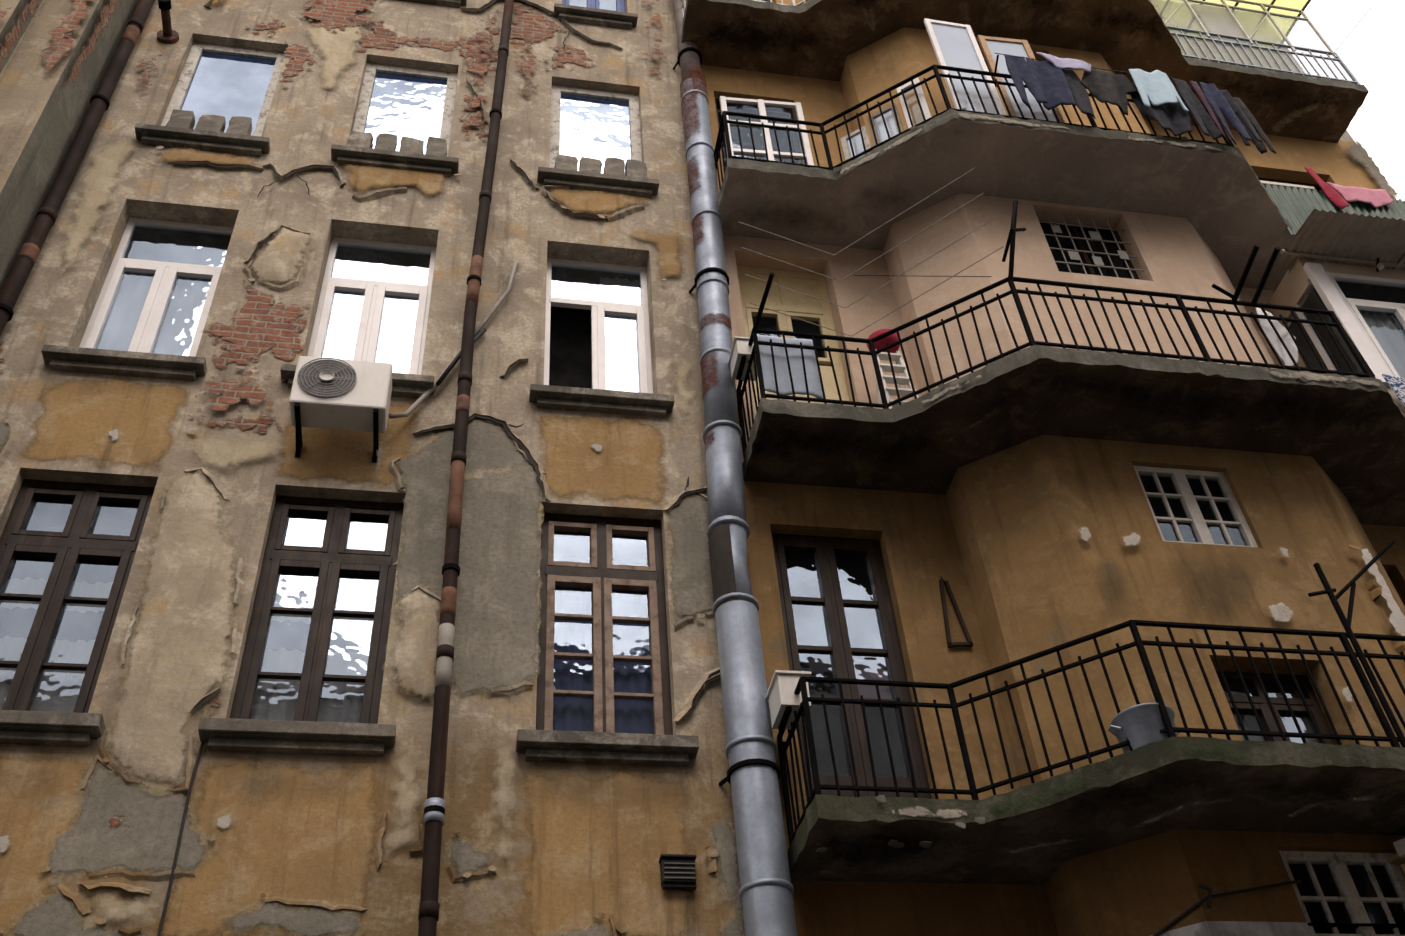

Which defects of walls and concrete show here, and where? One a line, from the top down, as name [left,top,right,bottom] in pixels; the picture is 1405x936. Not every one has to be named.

flaking render [41,0,121,101]
flaking render [245,19,317,88]
flaking render [297,0,596,140]
crack [461,0,623,51]
crack [173,161,346,198]
crack [510,159,608,220]
crack [244,225,282,263]
flaking render [187,280,310,435]
peeling [389,420,546,698]
spalling [1348,544,1405,666]
peeling [0,755,232,936]
peeling [222,893,367,936]